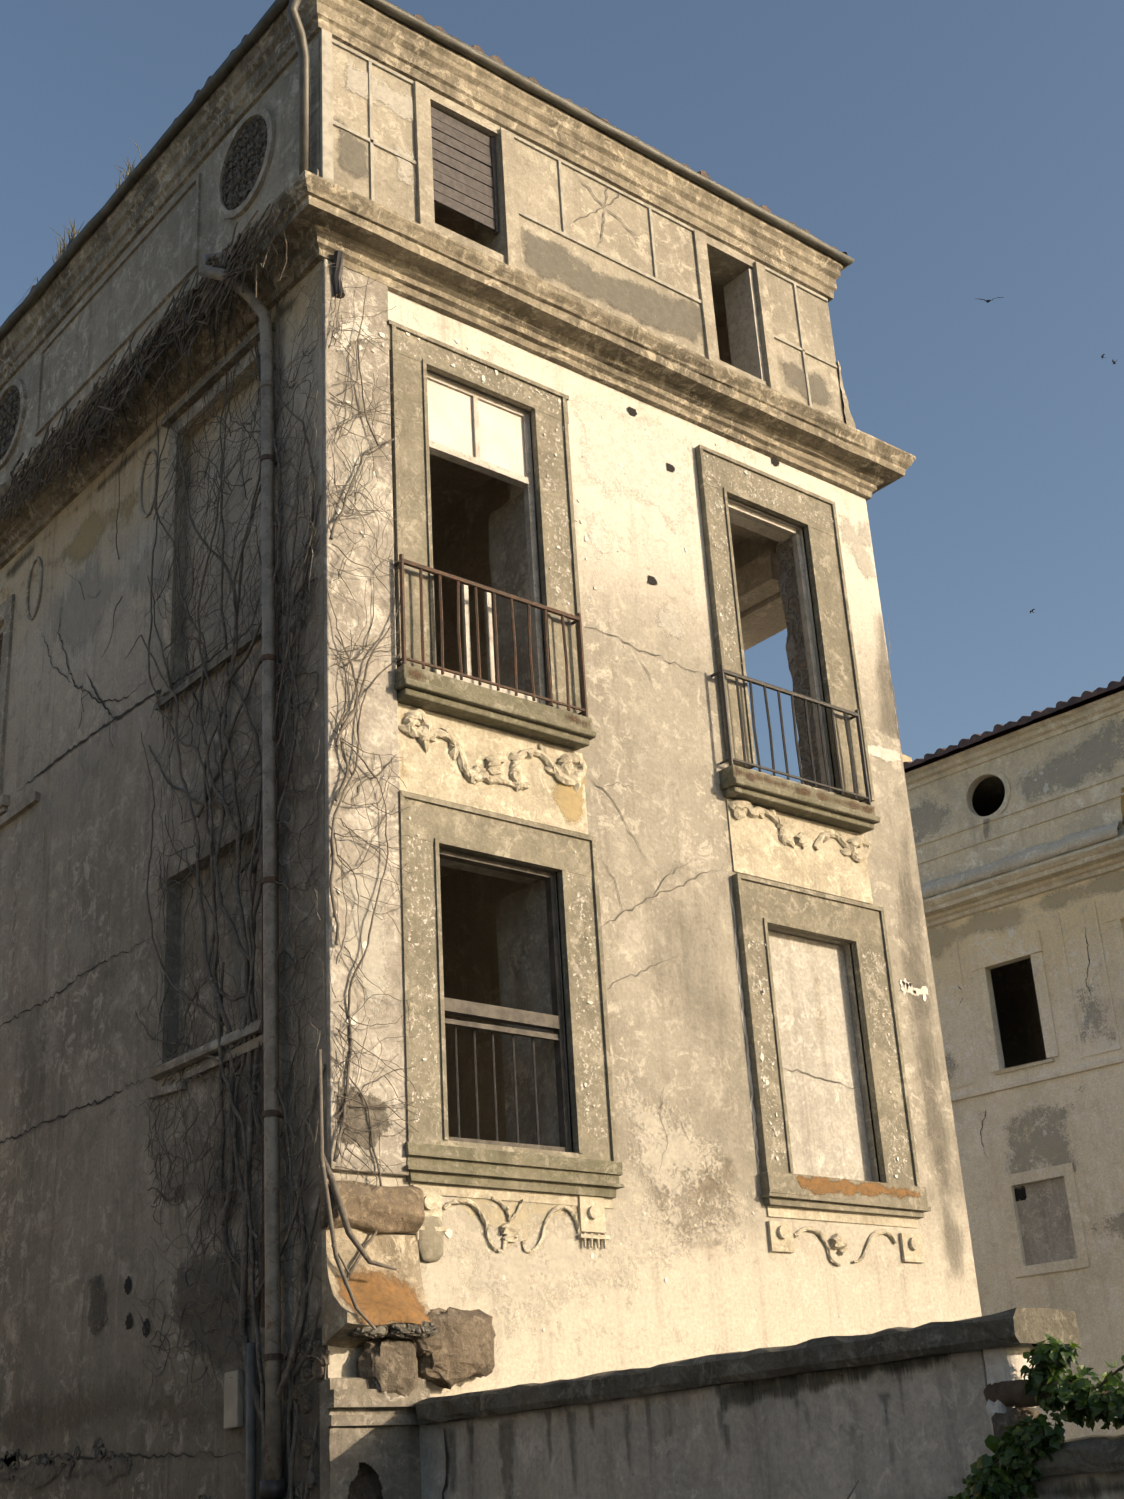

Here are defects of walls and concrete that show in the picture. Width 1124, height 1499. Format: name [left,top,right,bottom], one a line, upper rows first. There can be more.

crack [575,178,641,243]
water stain [523,230,704,341]
crack [588,776,723,927]
crack [1085,928,1093,1002]
flaking render [335,1082,392,1149]
peeling [347,873,755,1403]
rust [798,1176,920,1199]
peeling [1005,1105,1076,1201]
water stain [721,1354,948,1409]
crack [0,1451,246,1461]
flaking render [348,1462,383,1499]
crack [441,1429,449,1499]